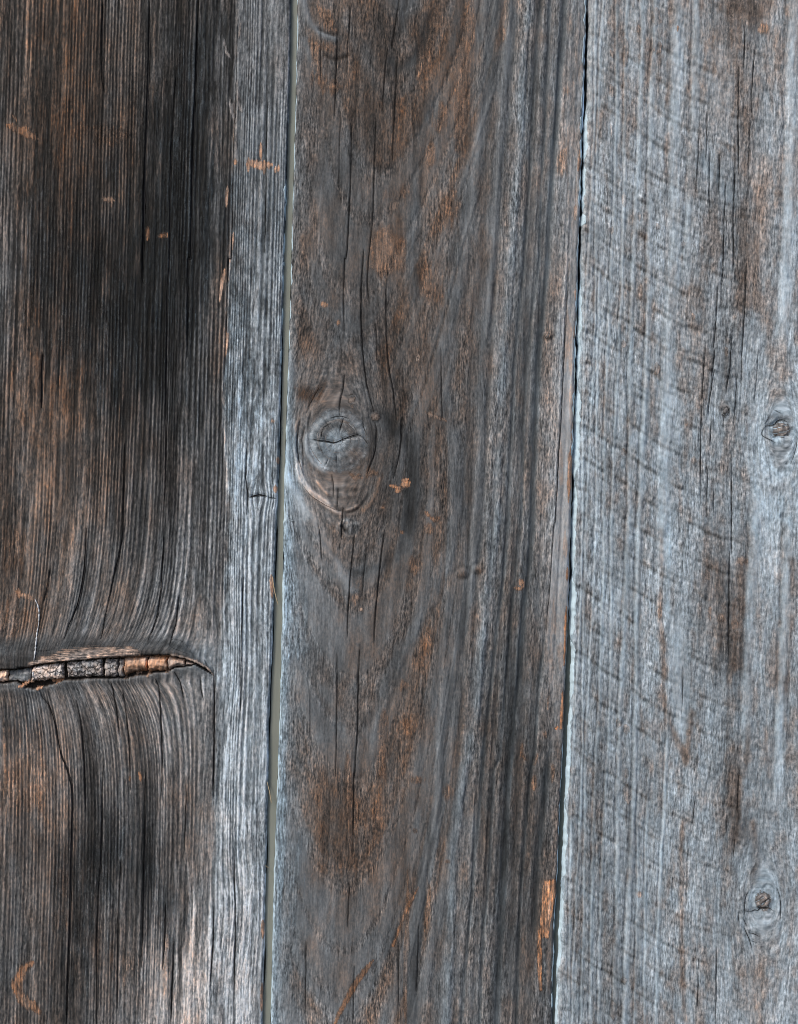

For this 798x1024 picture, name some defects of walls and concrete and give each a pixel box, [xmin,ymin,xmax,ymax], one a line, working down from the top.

crack [42,550,215,1015]